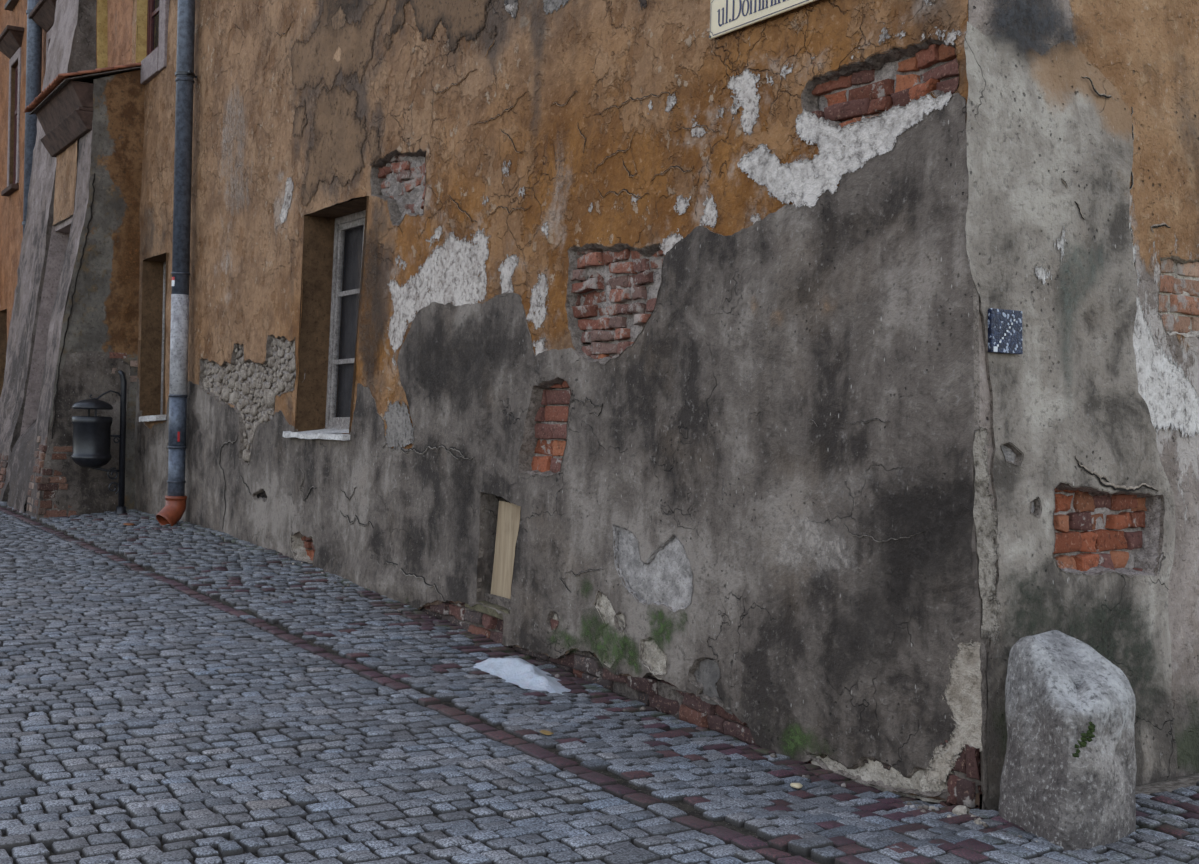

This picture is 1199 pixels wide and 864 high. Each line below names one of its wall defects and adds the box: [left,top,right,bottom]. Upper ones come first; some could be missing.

peeling [279,0,518,227]
crack [431,40,495,94]
crack [449,195,532,222]
crack [474,91,694,198]
crack [673,125,719,133]
flaking render [716,13,969,208]
peeling [526,273,549,356]
flaking render [565,193,719,365]
flaking render [1129,222,1199,441]
flaking render [199,334,305,465]
flaking render [1030,482,1163,577]
flaking render [421,590,759,746]